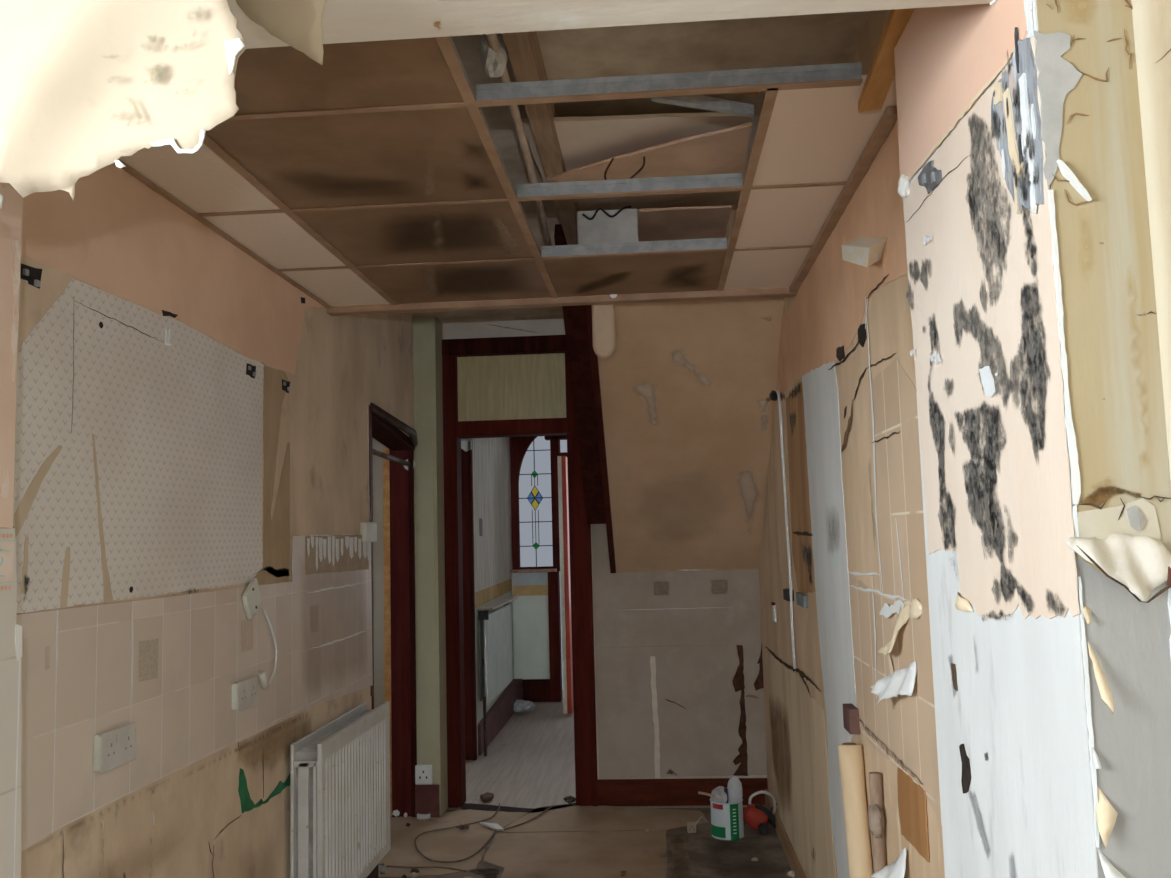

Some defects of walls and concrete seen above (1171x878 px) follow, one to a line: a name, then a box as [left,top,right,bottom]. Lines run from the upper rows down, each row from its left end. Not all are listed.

spalling [991,0,1092,214]
crack [1053,175,1092,206]
damp [906,260,930,309]
damp [922,115,1048,621]
peeling [246,363,290,585]
spalling [1077,498,1161,541]
damp [1046,590,1064,613]
crack [765,646,821,697]
spalling [732,643,764,776]